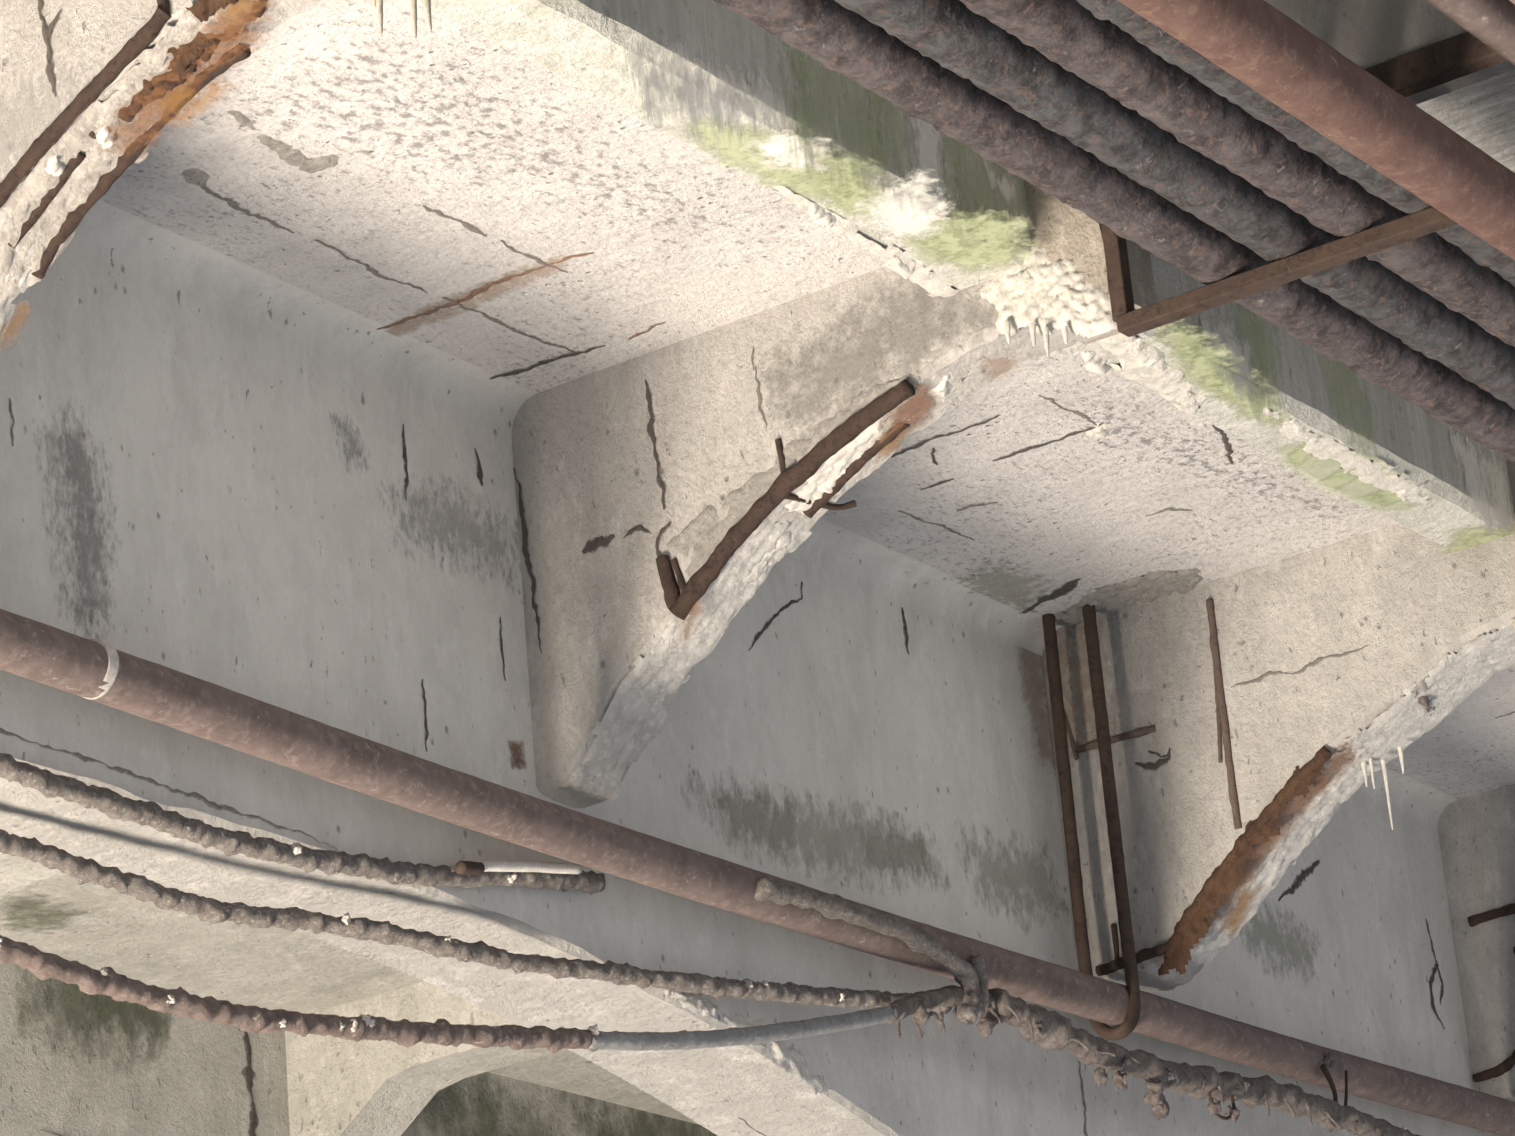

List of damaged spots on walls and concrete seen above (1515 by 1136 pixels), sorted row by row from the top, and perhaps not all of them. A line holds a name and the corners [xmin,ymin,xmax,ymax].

crack [38,0,62,96]
spalling [0,0,267,341]
corrosion [109,2,268,148]
spalling [227,110,339,174]
crack [189,179,666,379]
water stain [233,0,1429,517]
crack [582,379,671,557]
peeling [565,369,959,801]
corrosion [1204,746,1354,934]
peeling [1054,568,1515,977]
water stain [96,995,156,1027]
crack [241,1031,258,1136]